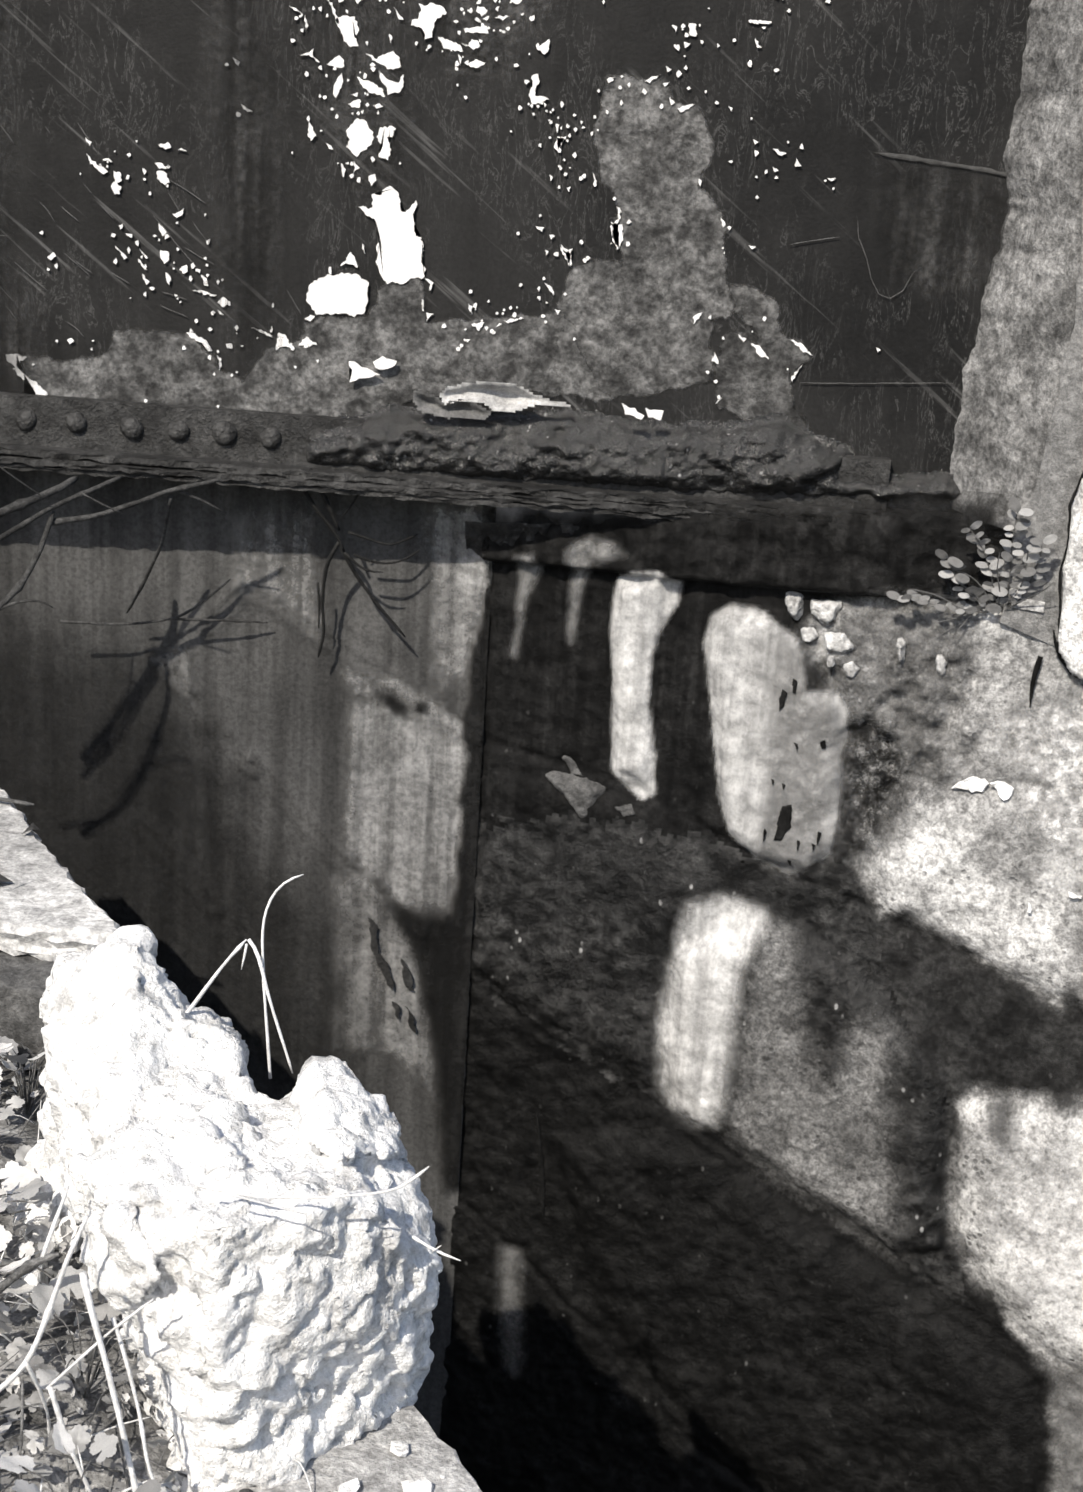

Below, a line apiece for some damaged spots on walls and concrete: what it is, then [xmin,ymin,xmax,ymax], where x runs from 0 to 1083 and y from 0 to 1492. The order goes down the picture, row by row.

peeling [747,20,772,67]
peeling [379,0,736,191]
peeling [80,138,186,195]
peeling [111,0,447,377]
peeling [753,139,803,179]
peeling [516,214,590,266]
peeling [456,289,522,351]
corrosion [20,74,961,507]
peeling [349,356,397,382]
peeling [706,316,769,403]
peeling [622,403,663,420]
crack [1029,472,1083,707]